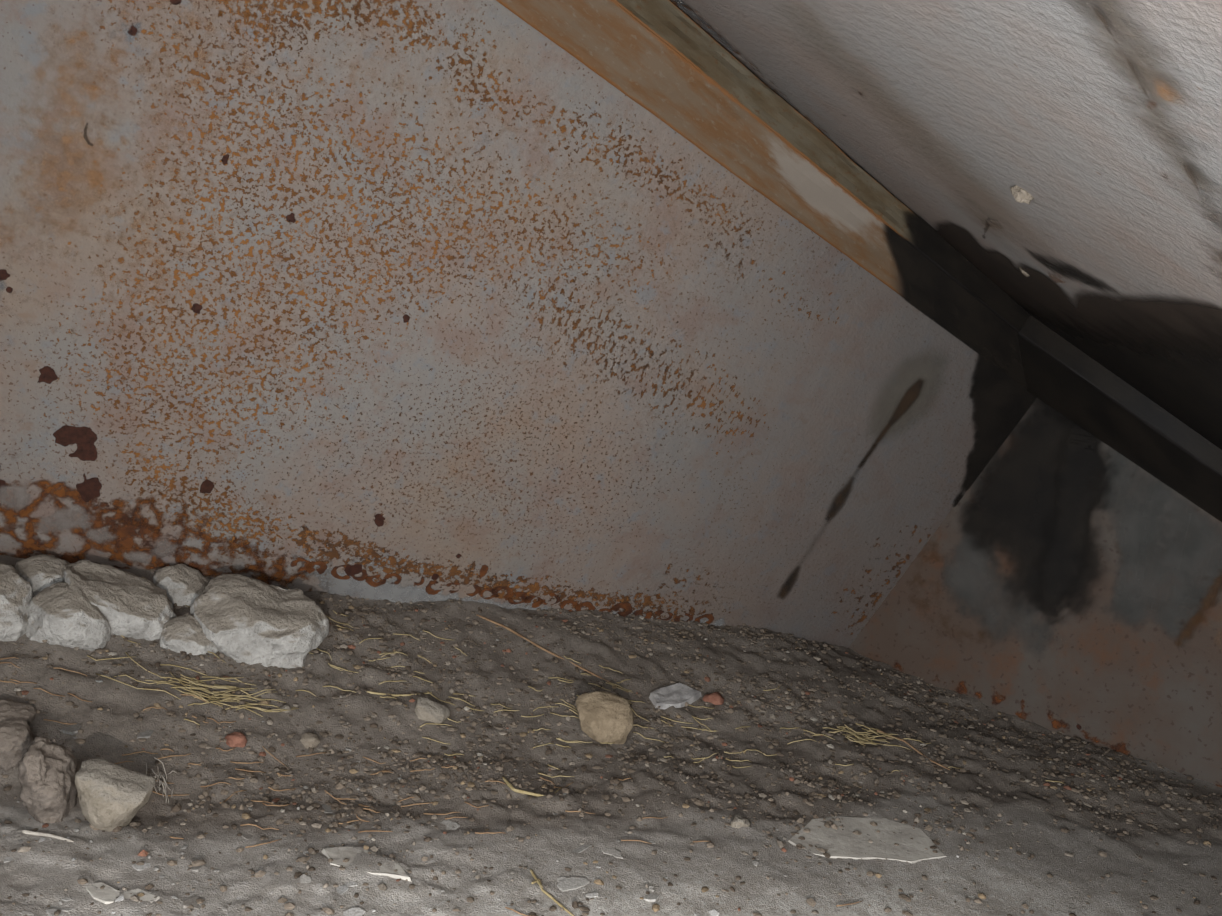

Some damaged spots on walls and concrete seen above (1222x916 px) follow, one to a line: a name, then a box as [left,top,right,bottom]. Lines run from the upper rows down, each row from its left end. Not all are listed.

rust [29,0,848,625]
damp [826,361,938,520]
damp [885,214,1222,645]
damp [779,567,799,598]
rust [833,519,934,635]